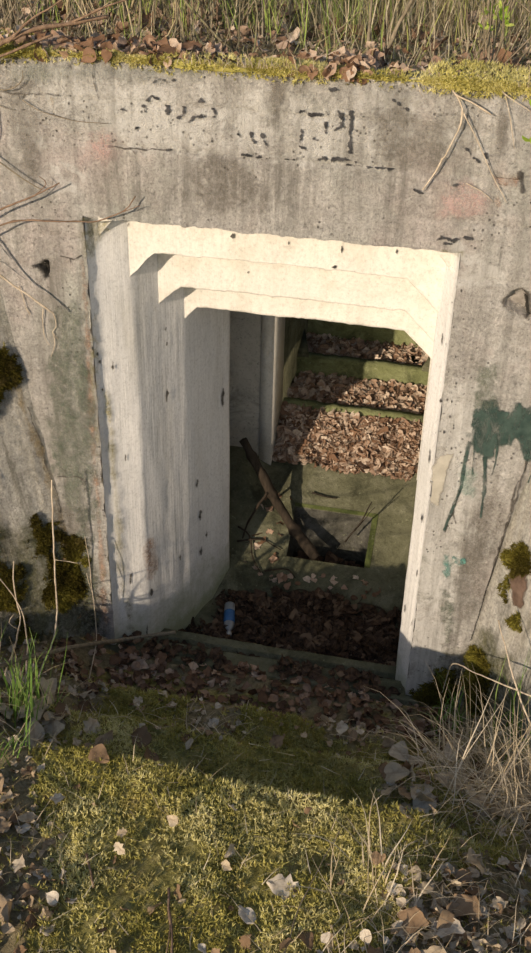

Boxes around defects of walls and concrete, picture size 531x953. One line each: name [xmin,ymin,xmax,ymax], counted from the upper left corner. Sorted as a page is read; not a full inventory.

spalling [31,260,50,278]
spalling [503,289,531,319]